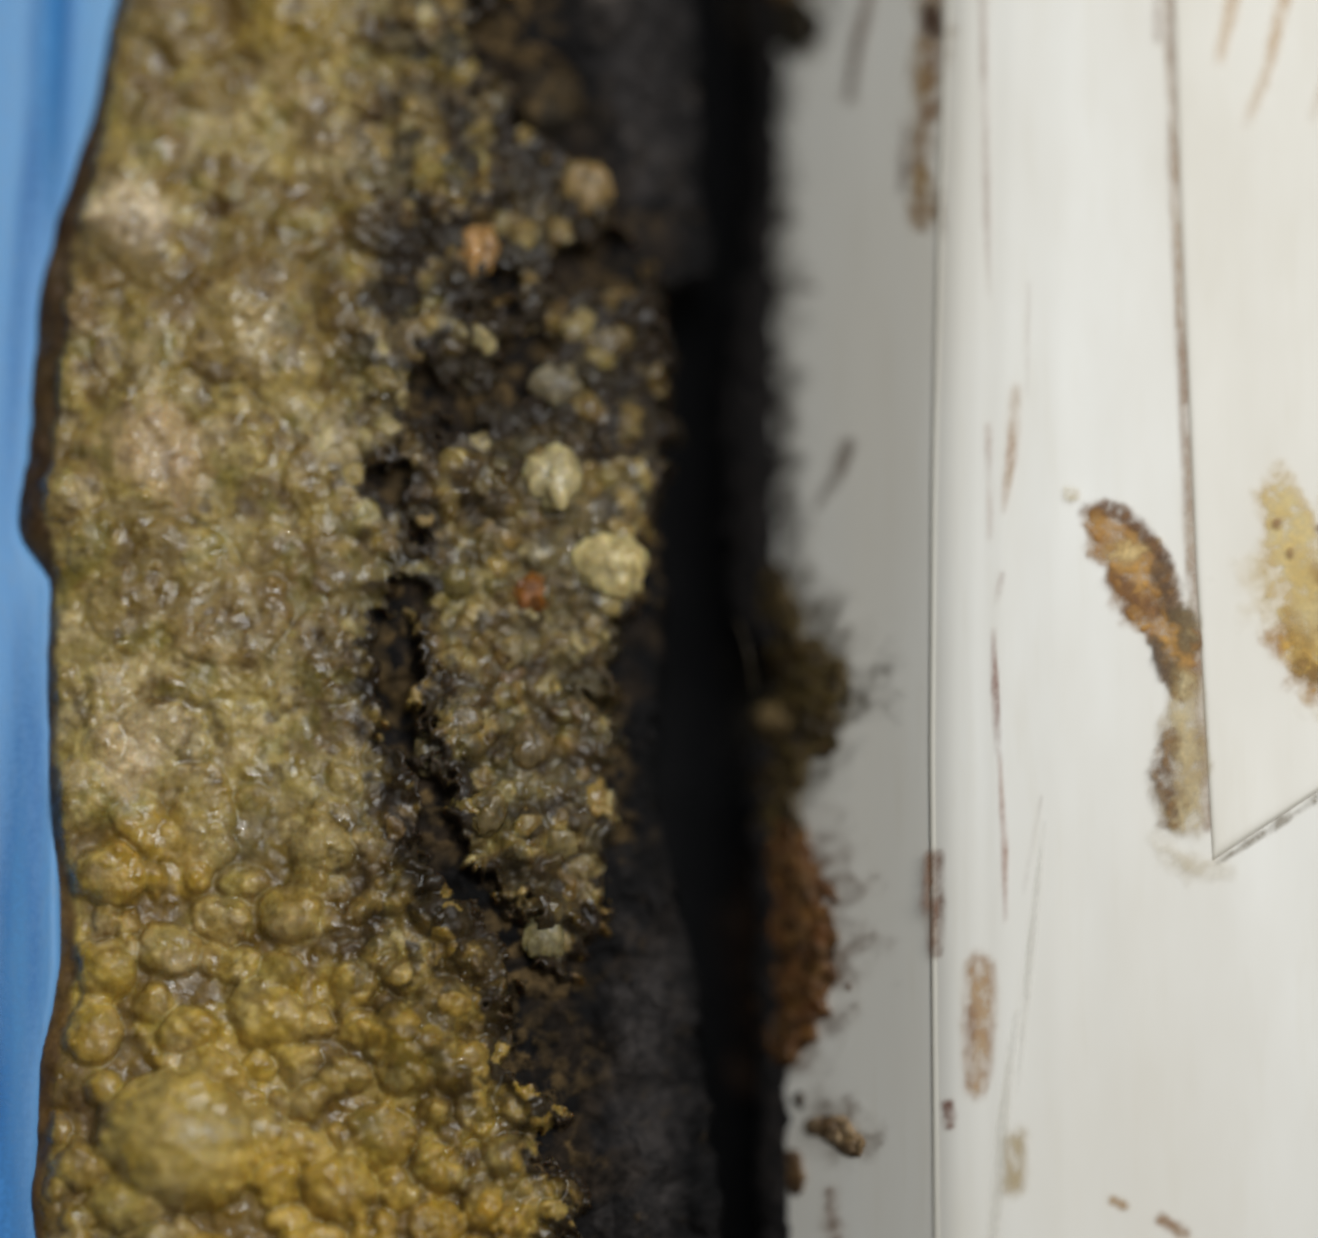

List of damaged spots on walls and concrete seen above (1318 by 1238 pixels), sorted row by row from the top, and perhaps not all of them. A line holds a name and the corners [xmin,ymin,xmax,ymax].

water stain [716,0,852,1238]
corrosion [1085,502,1204,831]